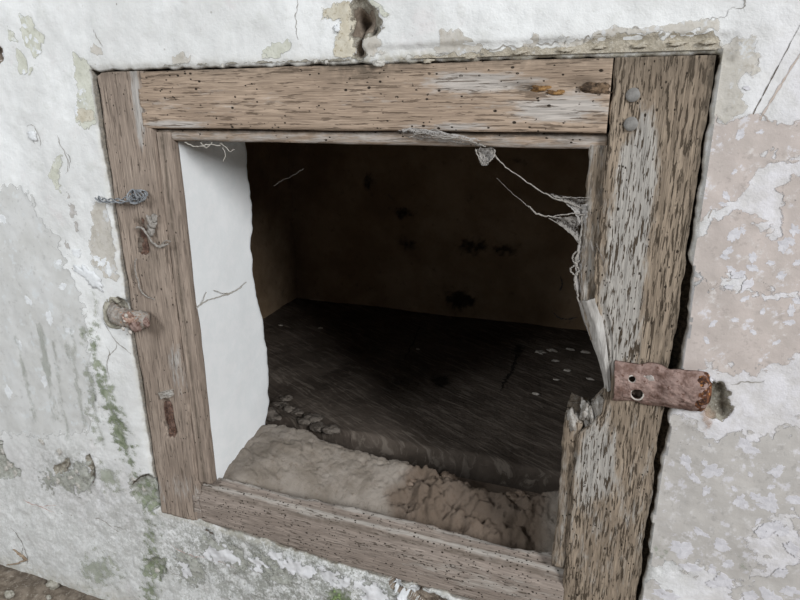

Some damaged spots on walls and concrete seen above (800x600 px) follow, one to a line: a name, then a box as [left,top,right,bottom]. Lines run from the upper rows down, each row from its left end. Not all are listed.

peeling [8,13,45,75]
crack [753,26,800,114]
peeling [48,155,79,232]
peeling [400,10,800,422]
leakage [37,329,54,380]
peeling [0,183,120,480]
spalling [103,297,132,335]
spalling [38,448,95,498]
peeling [649,415,800,600]